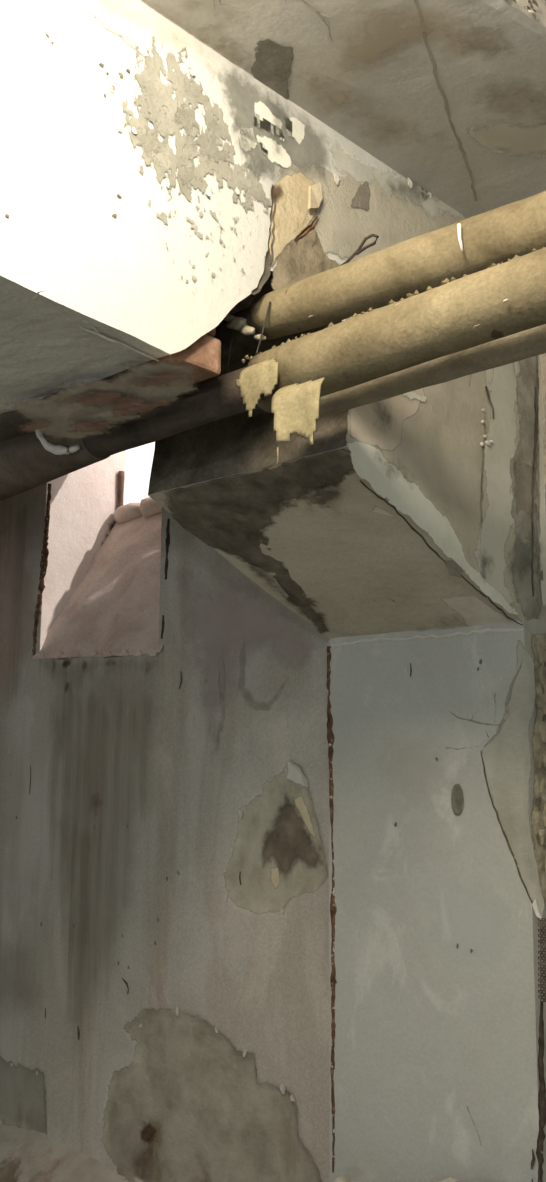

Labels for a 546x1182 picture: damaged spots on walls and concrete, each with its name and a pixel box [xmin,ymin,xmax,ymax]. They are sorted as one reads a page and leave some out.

spalling [506,0,546,18]
peeling [99,36,467,295]
spalling [12,306,221,455]
peeling [166,355,546,919]
corrosion [326,646,337,1172]
peeling [0,1057,46,1134]
peeling [102,1007,321,1182]